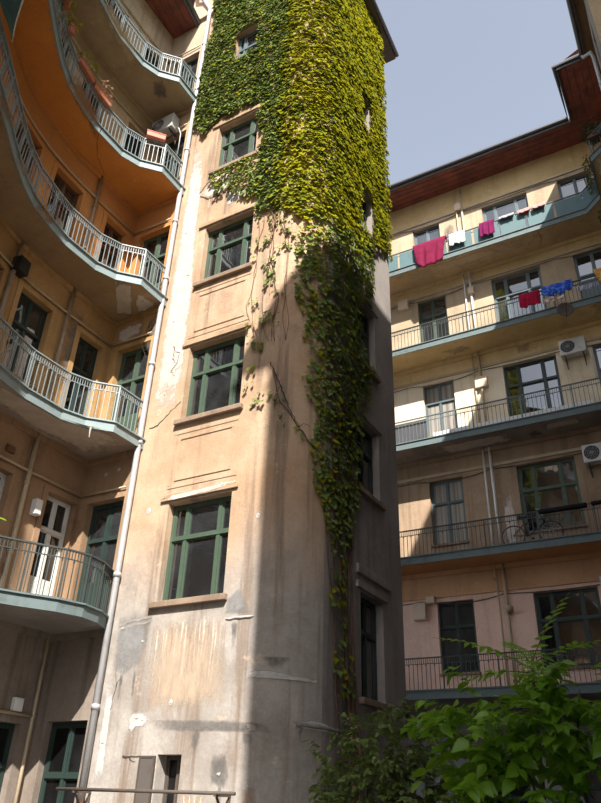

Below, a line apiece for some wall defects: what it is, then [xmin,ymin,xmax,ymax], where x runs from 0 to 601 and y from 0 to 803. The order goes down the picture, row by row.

peeling [118,323,143,342]
water stain [149,620,236,706]